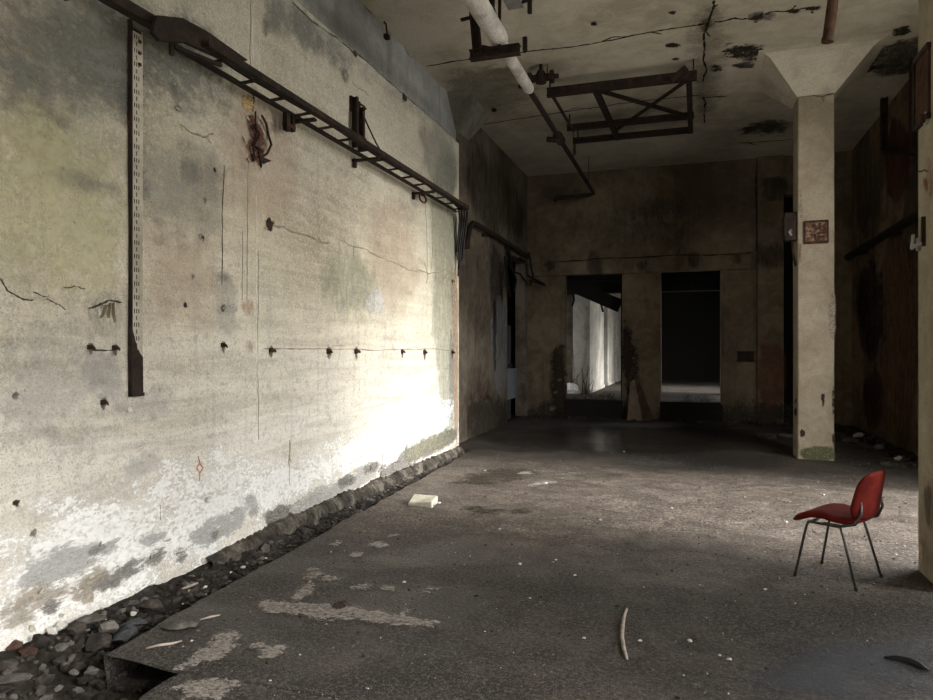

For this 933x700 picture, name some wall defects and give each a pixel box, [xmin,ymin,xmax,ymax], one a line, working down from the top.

water stain [892,26,911,36]
crack [405,49,469,66]
crack [484,0,809,125]
water stain [711,43,764,72]
crack [0,278,97,310]
crack [221,161,452,440]
water stain [0,394,455,644]